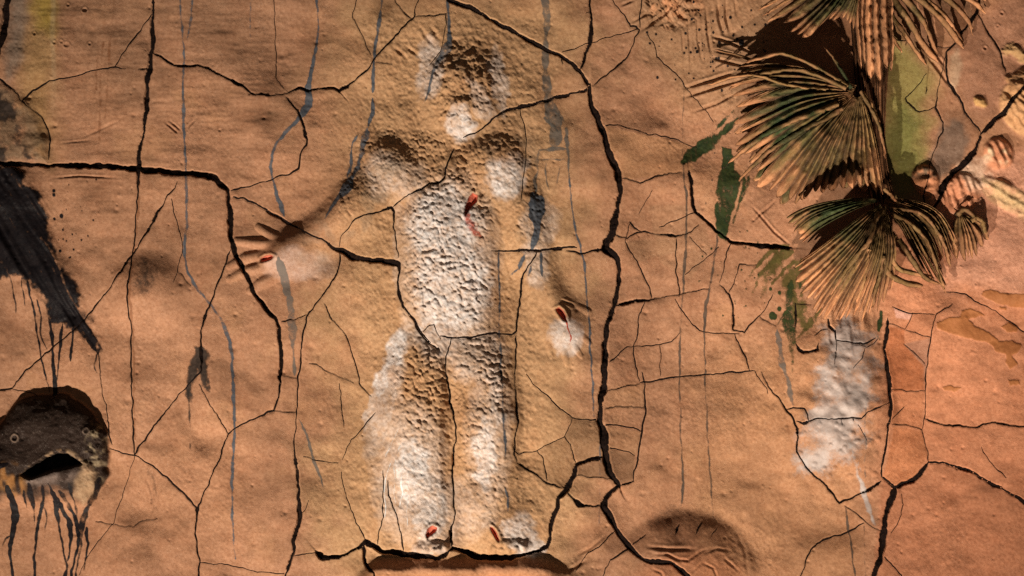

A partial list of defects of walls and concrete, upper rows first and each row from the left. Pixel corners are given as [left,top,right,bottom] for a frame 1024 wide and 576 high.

water stain [269,0,319,216]
water stain [326,0,382,216]
crack [905,0,1024,208]
water stain [9,276,98,399]
crack [0,0,792,576]
water stain [775,283,803,400]
water stain [799,317,869,470]
water stain [858,477,874,523]
crack [755,303,1024,576]
crack [946,292,1024,333]